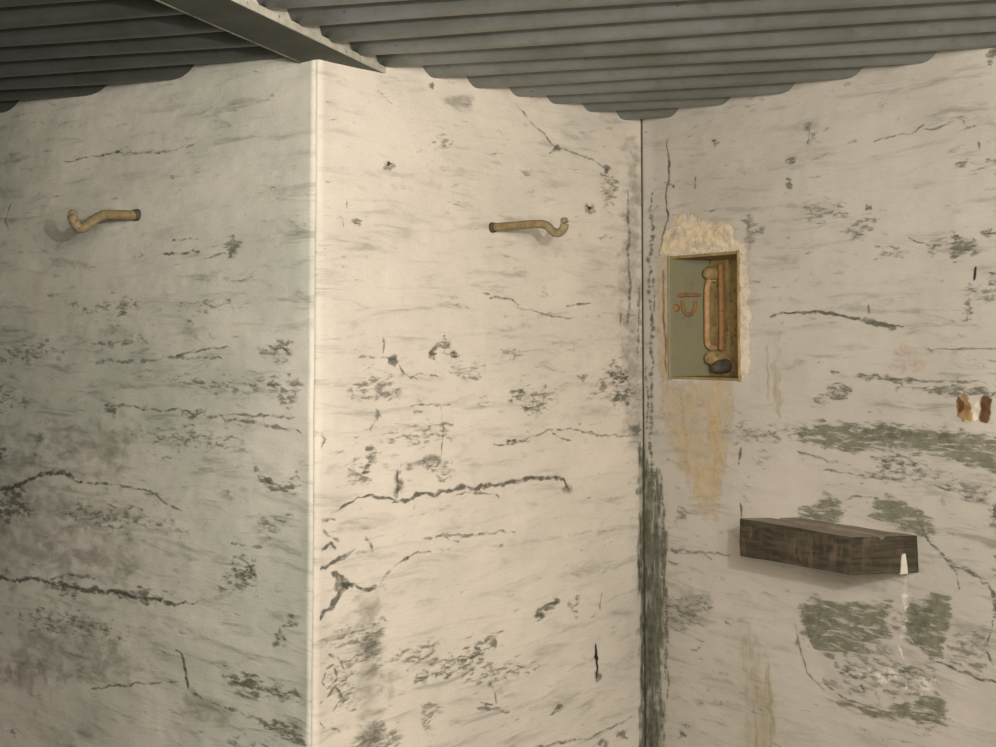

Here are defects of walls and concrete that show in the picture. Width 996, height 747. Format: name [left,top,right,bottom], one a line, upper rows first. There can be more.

water stain [668,246,728,256]
corrosion [956,394,992,423]
crack [0,471,175,524]
crack [340,472,570,509]
water stain [620,192,669,747]
water stain [865,579,936,691]